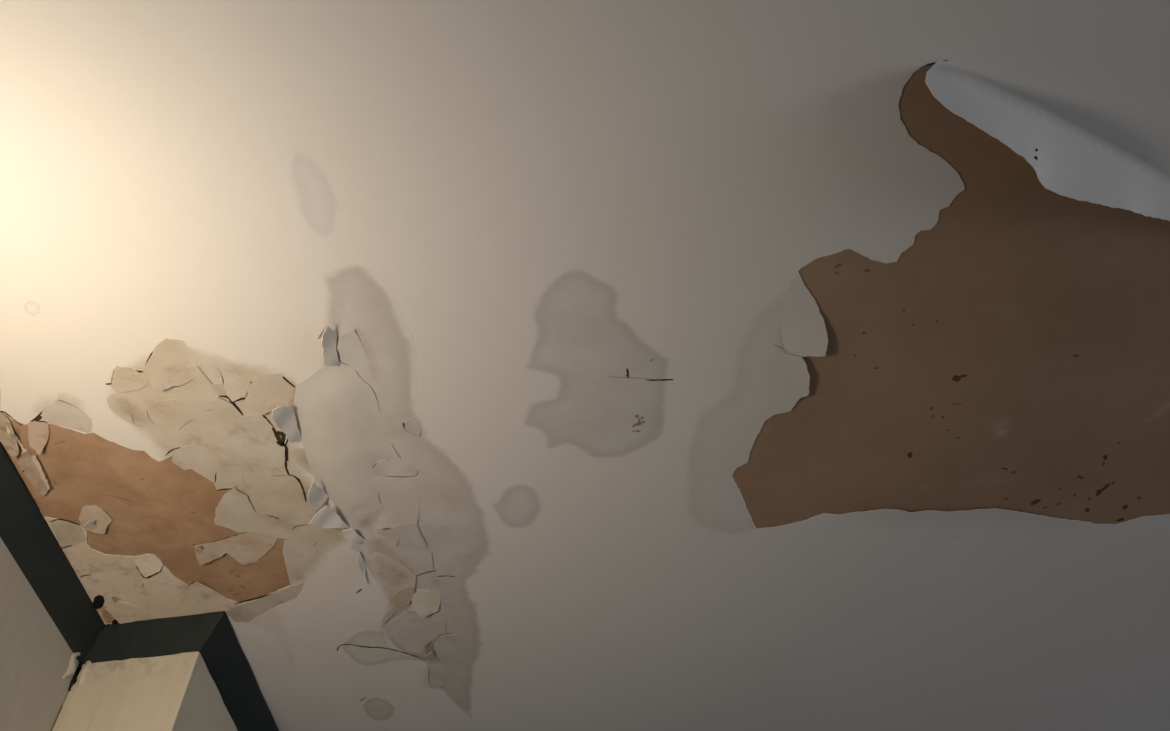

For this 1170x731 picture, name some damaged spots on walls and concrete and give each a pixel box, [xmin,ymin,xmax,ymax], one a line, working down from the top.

peeling [0,338,463,691]
water stain [25,262,544,722]
peeling [318,325,380,410]
water stain [520,266,674,461]
peeling [732,54,1170,531]